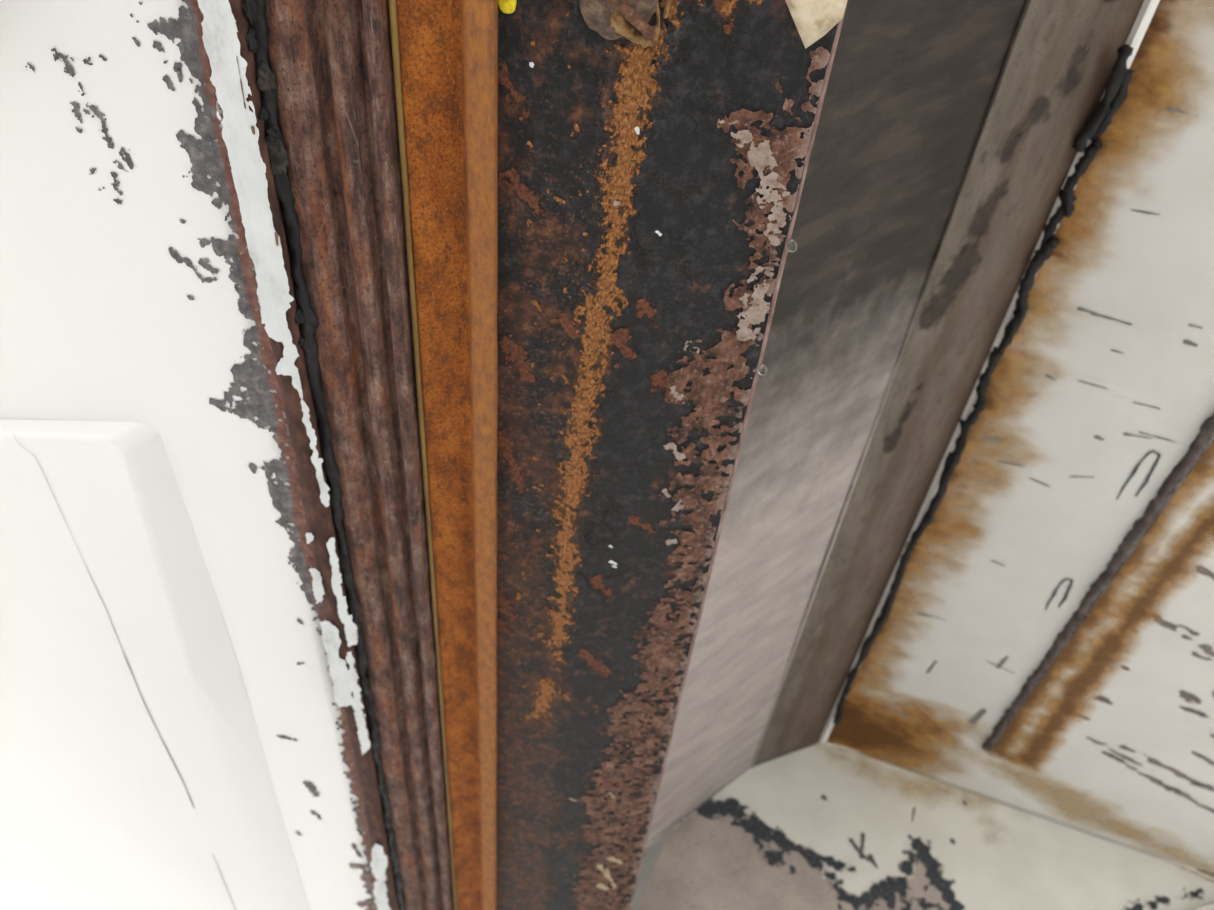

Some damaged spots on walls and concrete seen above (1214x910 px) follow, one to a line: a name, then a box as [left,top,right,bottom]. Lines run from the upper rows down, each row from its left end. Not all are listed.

peeling [51,48,137,205]
rust [698,0,762,35]
crack [15,438,195,809]
peeling [130,0,378,910]
rust [497,0,684,723]
peeling [569,47,965,910]
rust [827,0,1195,772]
rust [988,440,1214,841]
peeling [1086,737,1214,813]
peeling [1124,888,1204,910]
peeling [1153,614,1214,661]
peeling [1179,691,1214,718]